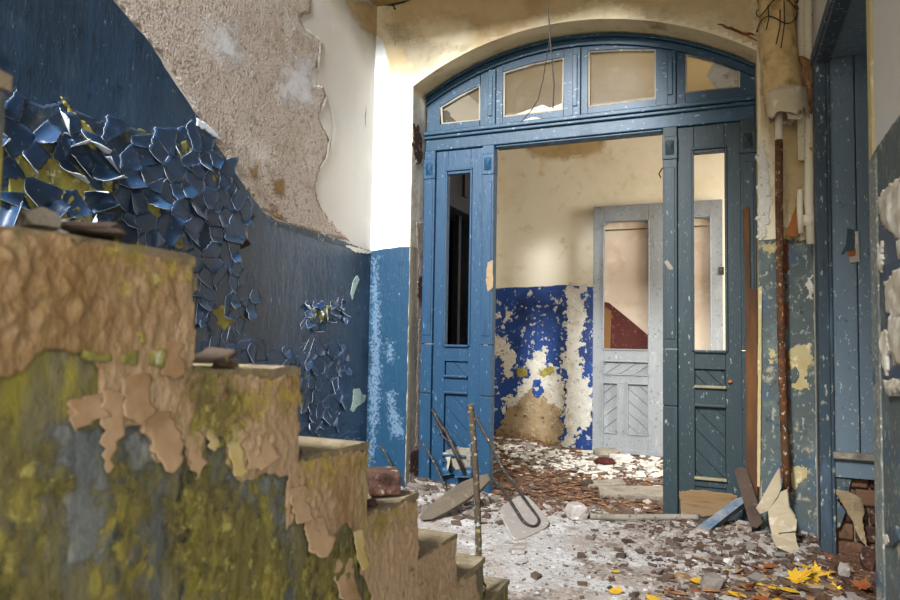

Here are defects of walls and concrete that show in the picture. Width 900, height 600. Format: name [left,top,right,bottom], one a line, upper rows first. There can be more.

peeling [755,140,776,255]
peeling [0,0,480,600]
peeling [494,282,663,486]
peeling [786,343,814,391]